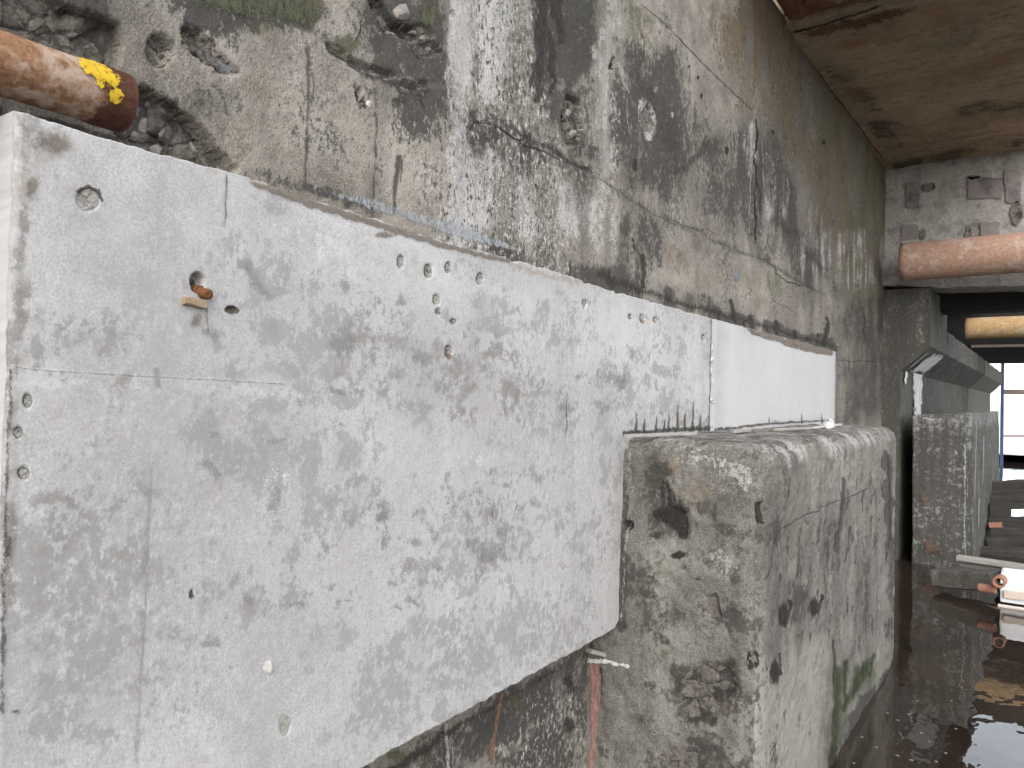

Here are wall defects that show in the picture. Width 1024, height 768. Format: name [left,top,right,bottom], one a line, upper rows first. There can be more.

spalling [145,35,172,68]
spalling [181,33,233,75]
leakage [594,0,630,178]
crack [596,177,722,245]
crack [733,119,815,290]
leakage [632,238,647,289]
leakage [717,299,780,336]
leakage [793,316,830,347]
spalling [649,476,689,559]
crack [766,488,867,579]
corrosion [589,663,603,768]
spalling [676,661,742,727]